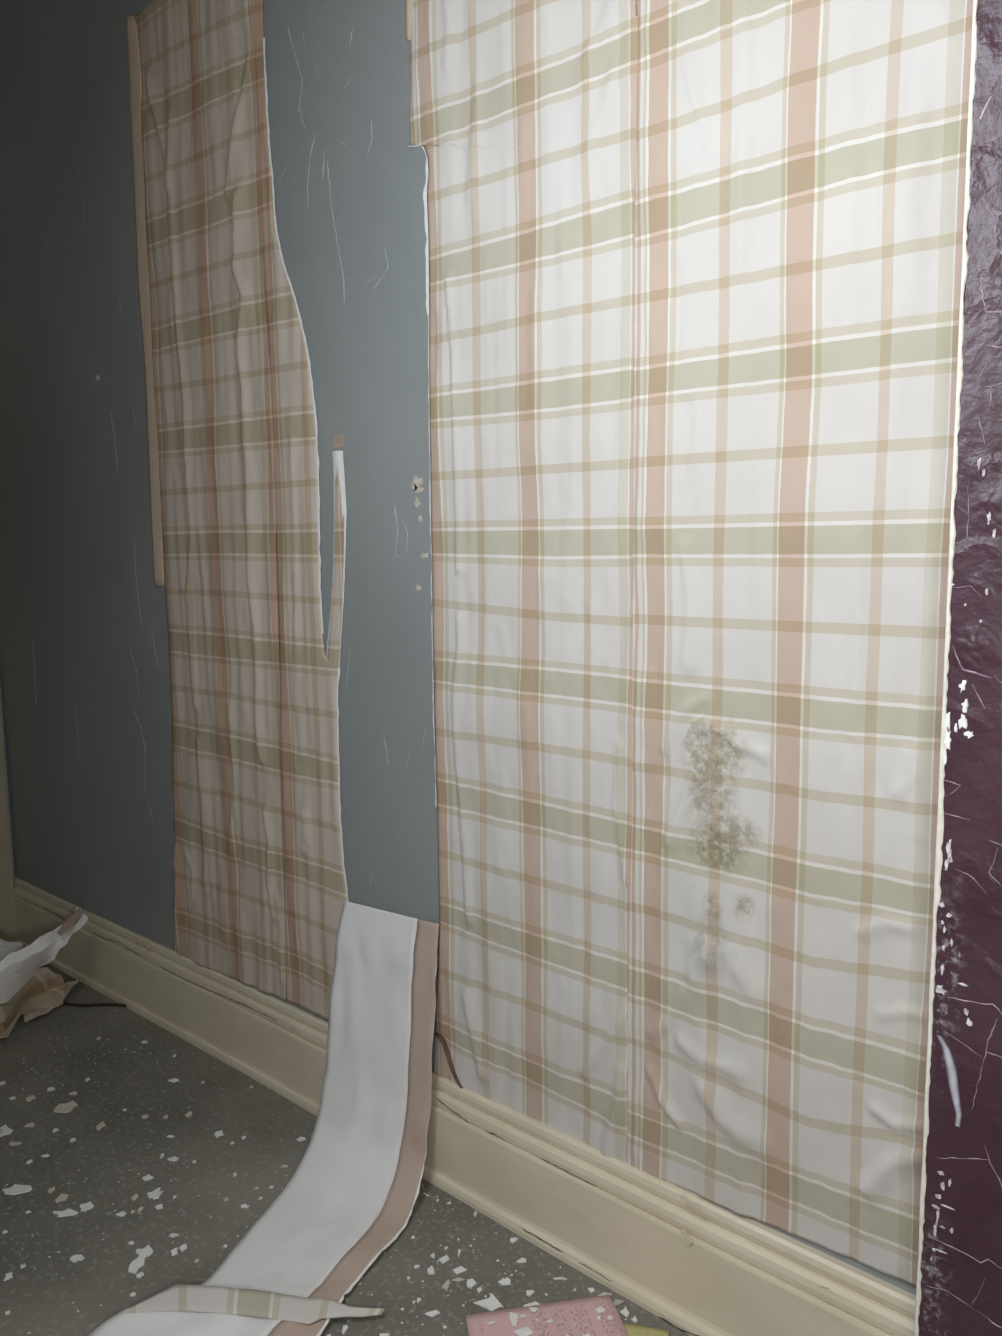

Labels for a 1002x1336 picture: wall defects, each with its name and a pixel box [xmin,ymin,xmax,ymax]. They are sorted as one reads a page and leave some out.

crack [974,96,1000,149]
crack [980,197,1002,313]
crack [979,345,1002,444]
peeling [411,476,424,522]
crack [959,481,974,542]
crack [952,645,1002,708]
crack [944,764,1002,894]
crack [946,997,1002,1110]
crack [941,1145,1002,1187]
crack [926,1236,1002,1328]